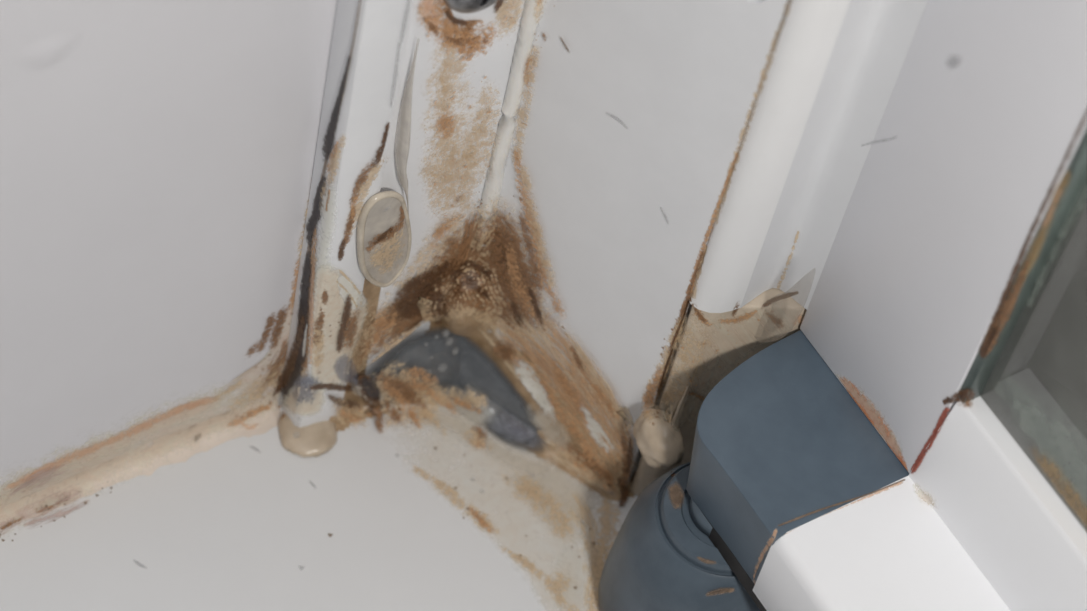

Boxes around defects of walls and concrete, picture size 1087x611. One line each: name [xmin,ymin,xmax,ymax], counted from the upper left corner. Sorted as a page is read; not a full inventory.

corrosion [418,0,522,73]
crack [277,0,361,405]
water stain [316,123,389,269]
water stain [310,151,567,433]
corrosion [487,0,801,507]
water stain [0,481,113,541]
water stain [415,468,498,533]
water stain [504,477,620,611]